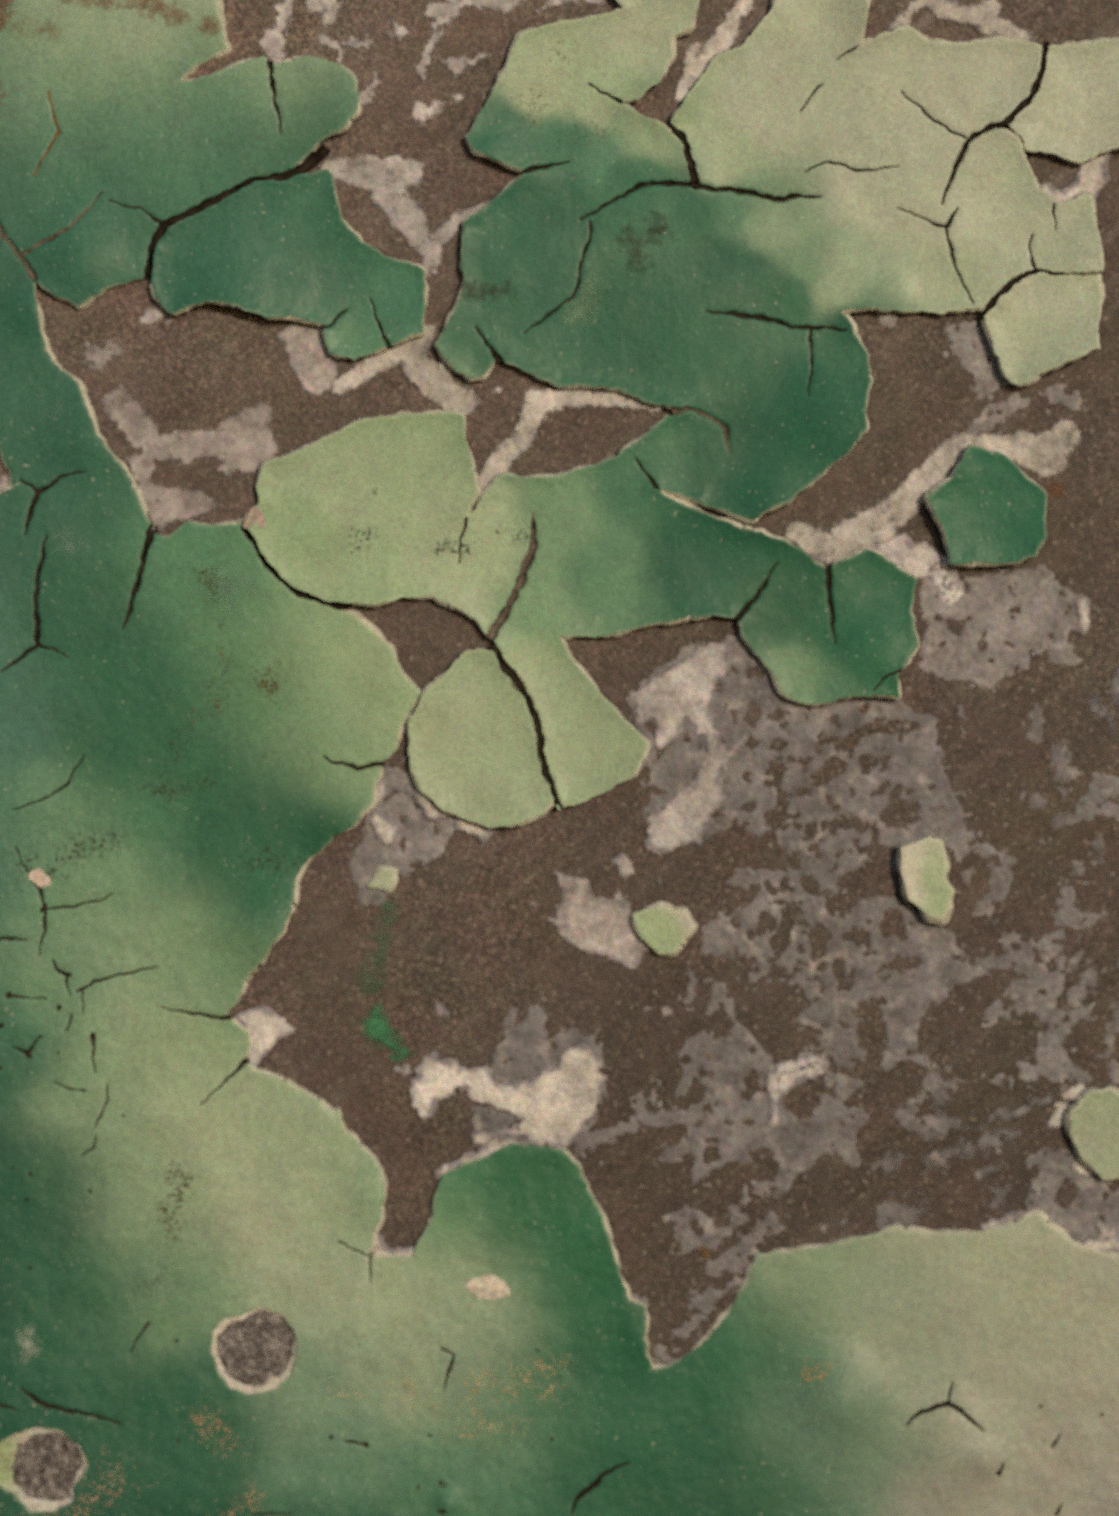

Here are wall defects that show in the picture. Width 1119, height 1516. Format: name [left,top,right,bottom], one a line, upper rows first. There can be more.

crack [0,143,331,280]
crack [474,123,900,364]
crack [897,41,1064,317]
peeling [33,278,444,477]
crack [122,524,158,630]
crack [241,528,350,609]
crack [486,512,563,808]
peeling [148,0,1119,1364]
crack [0,846,158,1157]
spalling [0,1427,86,1511]
spalling [211,1308,296,1394]
crack [906,1381,985,1432]